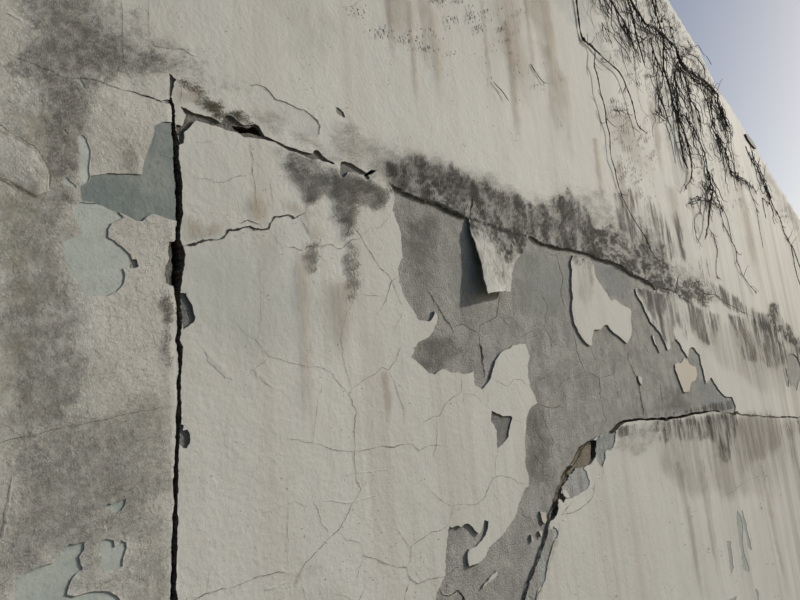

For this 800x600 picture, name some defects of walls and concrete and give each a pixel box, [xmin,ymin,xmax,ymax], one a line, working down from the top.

water stain [24,0,127,177]
water stain [160,295,176,365]
peeling [62,106,376,296]
crack [0,0,526,600]
water stain [290,153,800,371]
spalling [391,185,736,600]
crack [506,236,799,600]
water stain [655,383,738,462]
peeling [14,542,120,600]
peeling [101,539,127,573]
peeling [724,511,752,573]